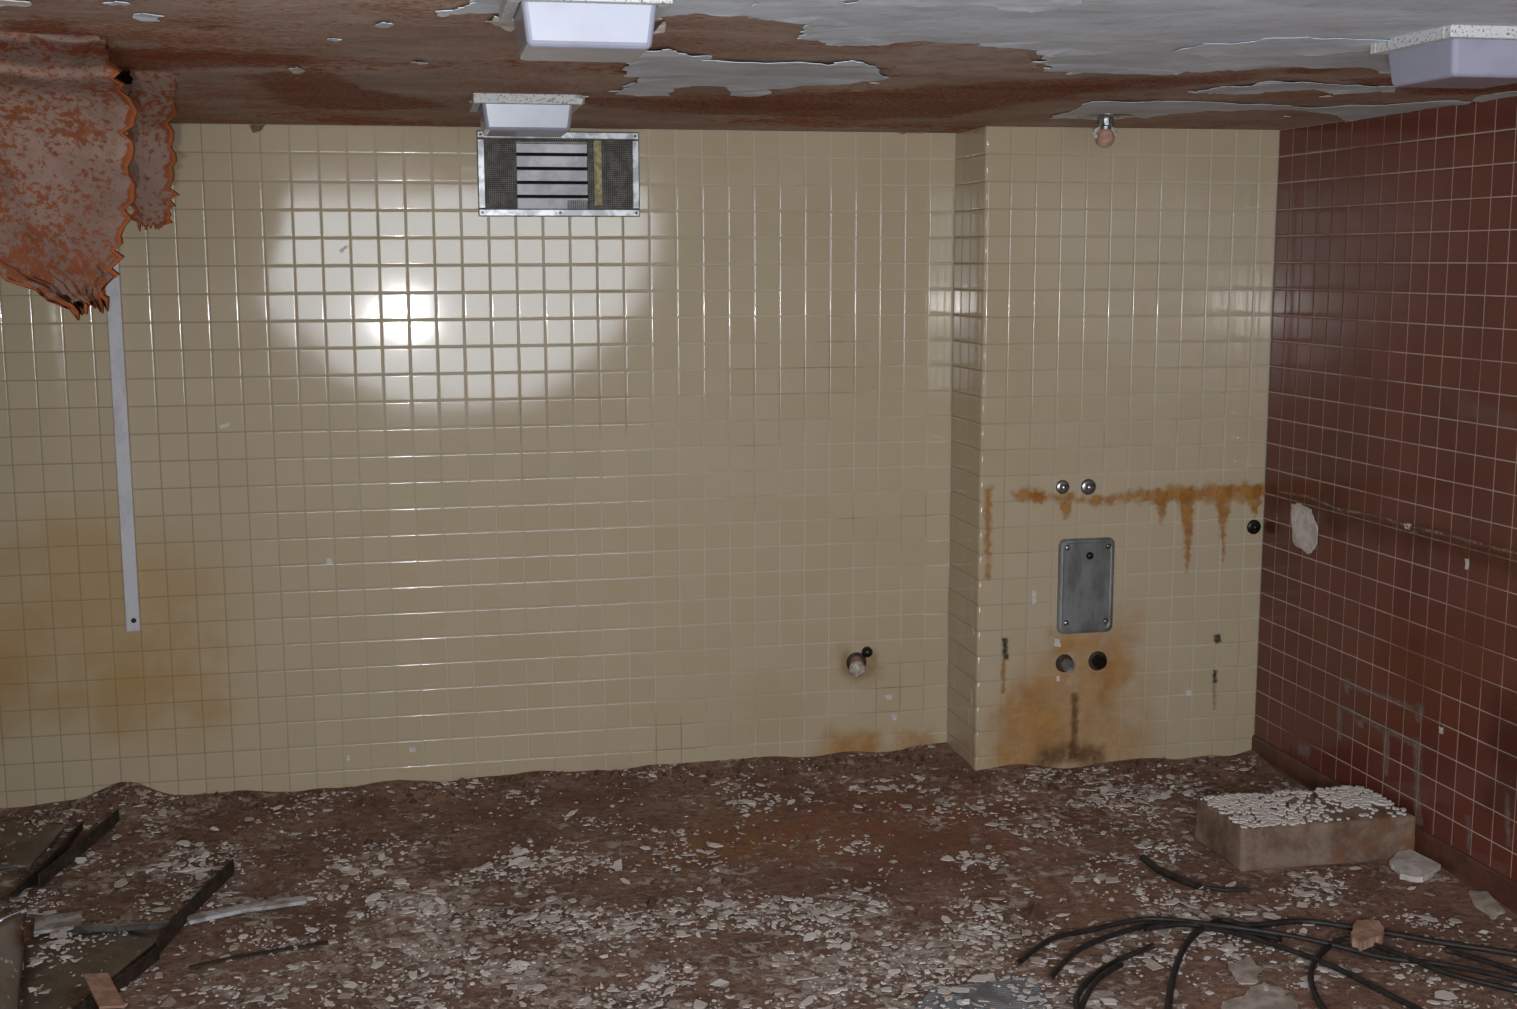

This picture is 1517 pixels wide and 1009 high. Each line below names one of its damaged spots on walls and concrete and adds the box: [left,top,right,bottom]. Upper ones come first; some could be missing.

peeling [436,0,502,17]
peeling [608,0,1517,122]
corrosion [1015,485,1265,561]